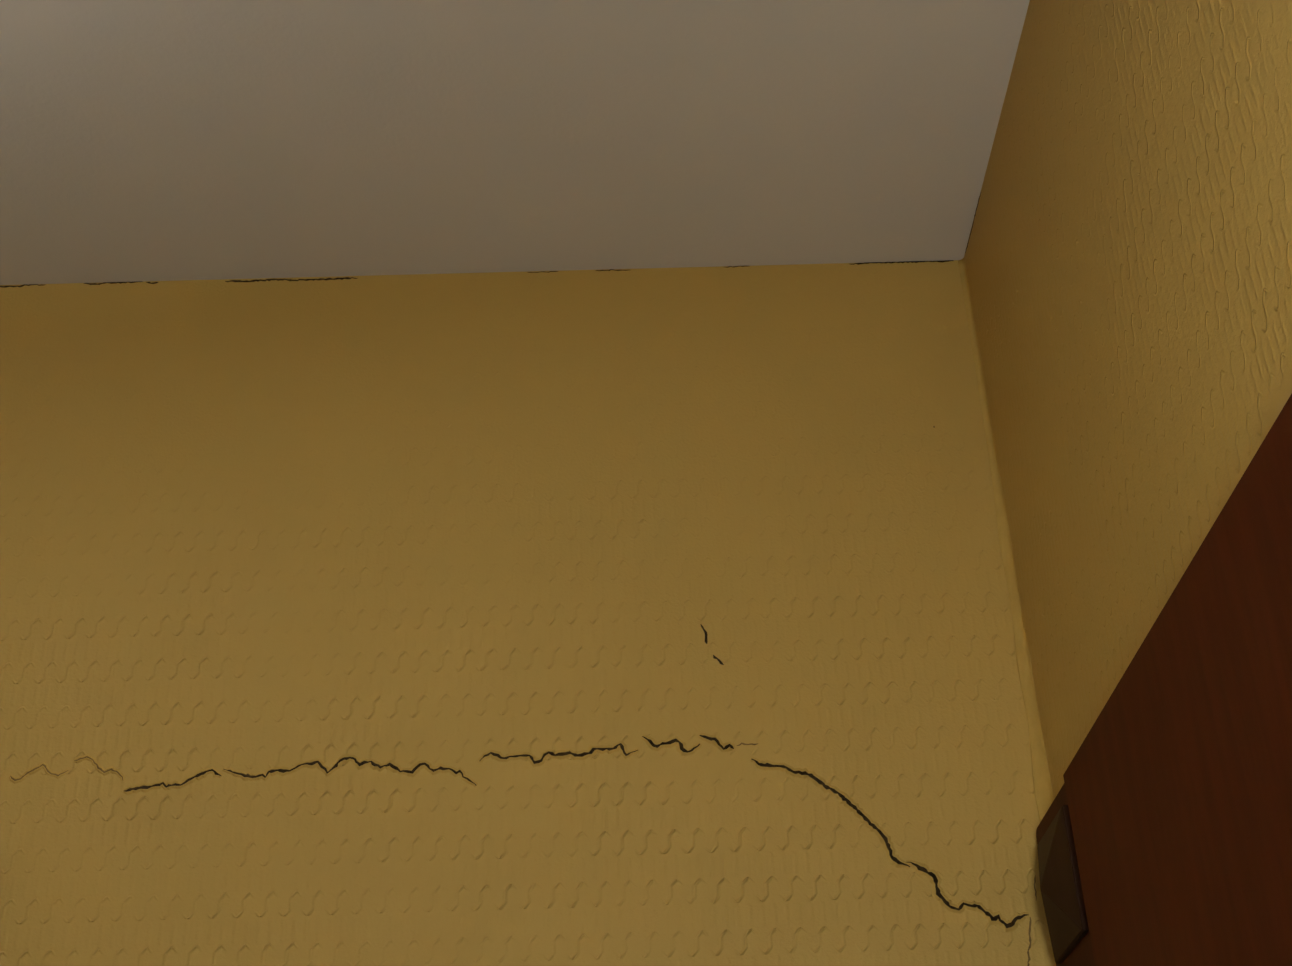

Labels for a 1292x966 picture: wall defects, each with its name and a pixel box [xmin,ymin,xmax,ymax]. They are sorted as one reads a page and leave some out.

crack [700,624,724,665]
crack [9,733,1029,933]